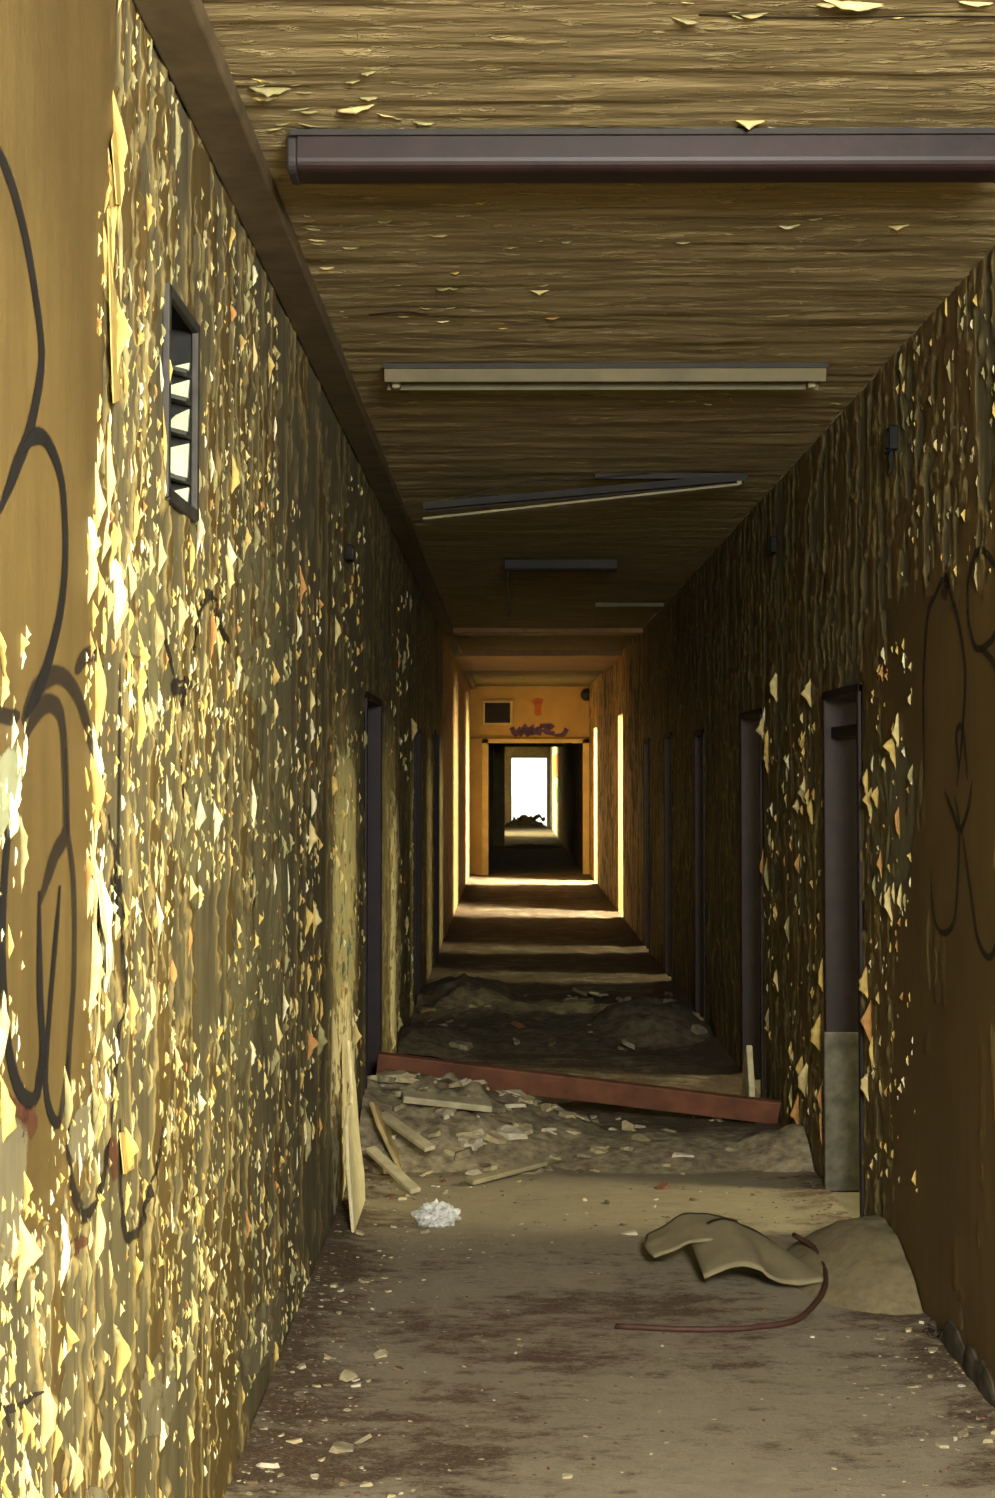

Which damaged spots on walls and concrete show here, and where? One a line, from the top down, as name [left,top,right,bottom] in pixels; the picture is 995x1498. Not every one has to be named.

peeling [814,0,904,19]
peeling [338,71,433,129]
peeling [399,272,490,323]
peeling [896,294,995,486]
peeling [908,494,992,591]
flaking render [0,0,368,1498]
peeling [391,629,418,781]
flaking render [390,790,414,1051]
peeling [755,672,824,1146]
peeling [867,1136,917,1192]